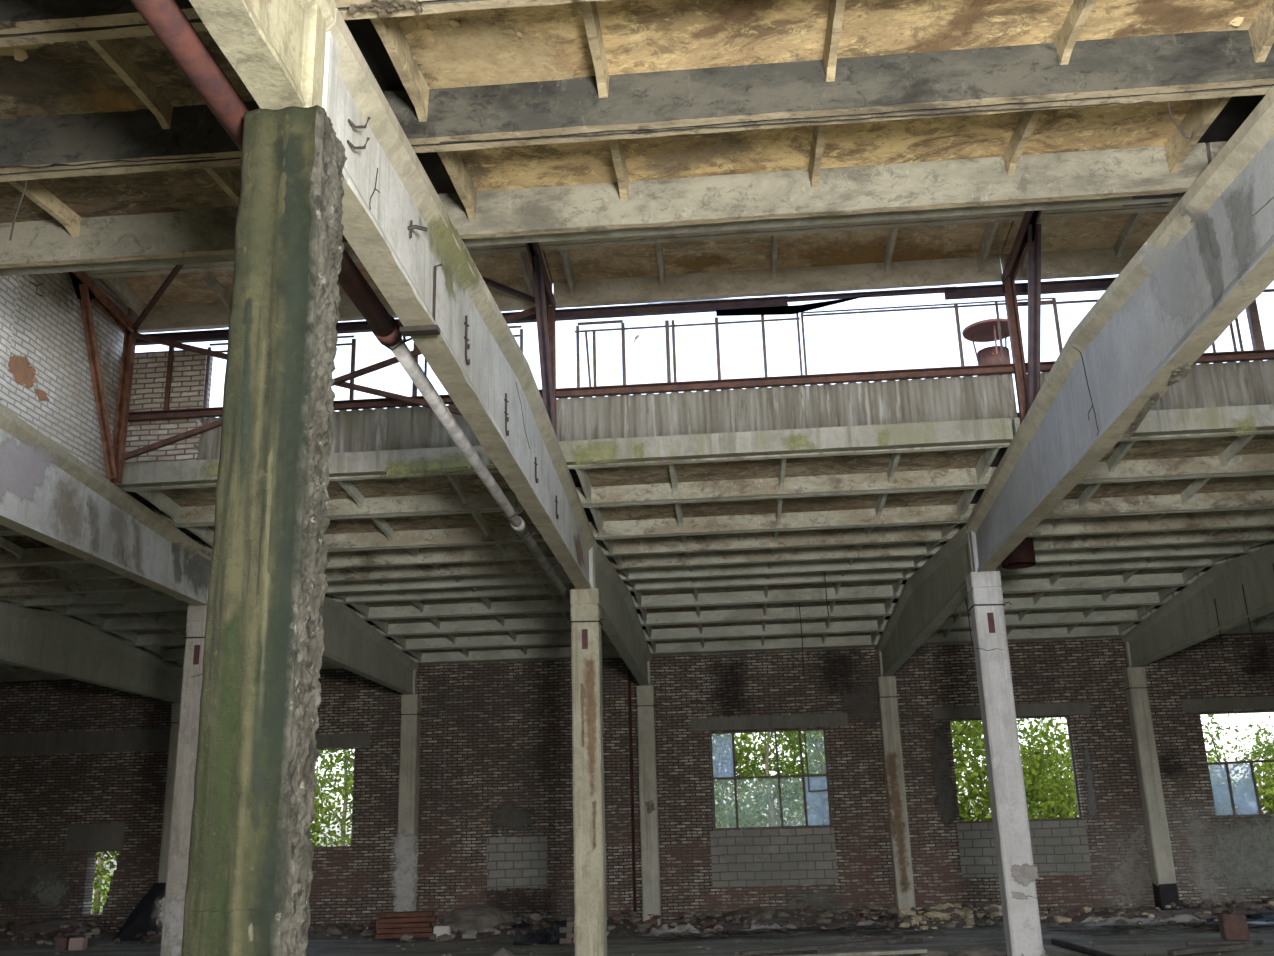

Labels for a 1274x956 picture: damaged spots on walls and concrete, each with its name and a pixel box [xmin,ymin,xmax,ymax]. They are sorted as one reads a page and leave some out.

peeling [0,42,55,61]
peeling [20,366,49,401]
water stain [232,136,313,956]
rust [580,661,596,849]
rust [884,753,909,891]
peeling [1012,864,1039,900]